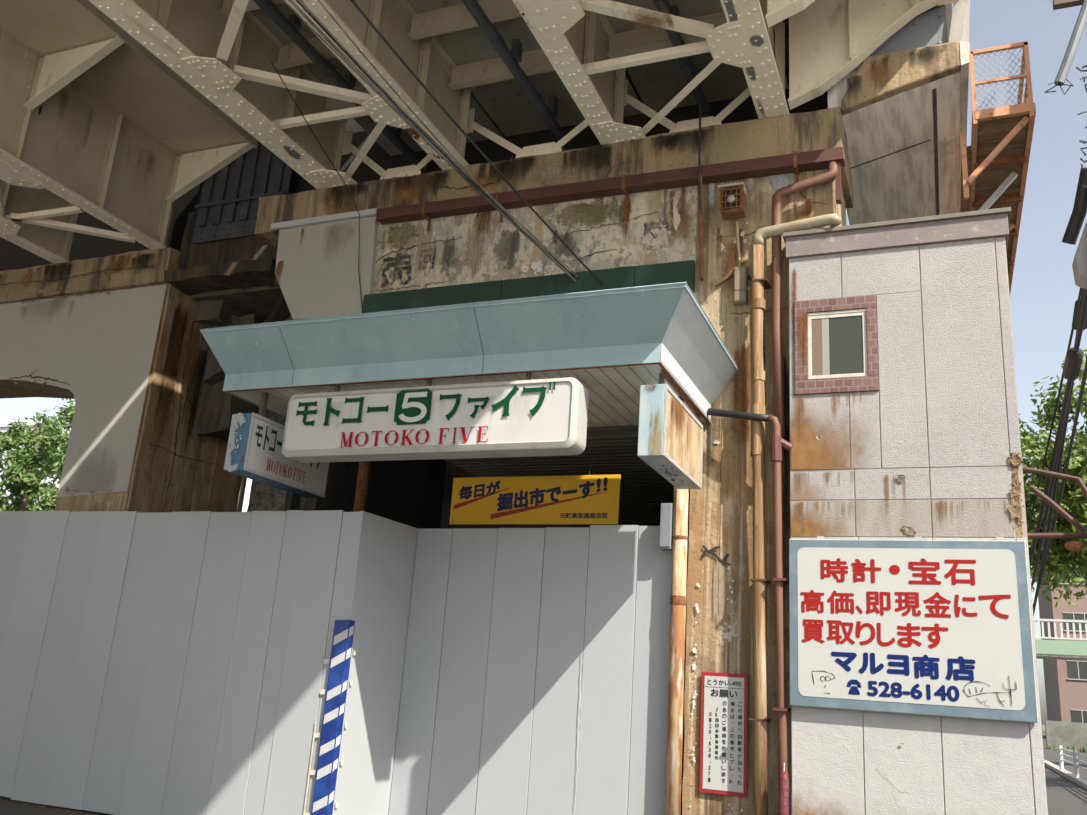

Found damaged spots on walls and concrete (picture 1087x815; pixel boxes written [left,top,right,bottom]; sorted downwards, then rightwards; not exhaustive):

leakage [480,145,611,184]
leakage [396,171,447,191]
crack [541,212,655,263]
rust [619,199,630,231]
peeling [619,195,682,267]
rust [664,187,688,235]
leakage [27,263,72,295]
peeling [513,255,572,276]
crack [0,371,70,385]
rust [791,418,847,470]
rust [791,515,826,537]